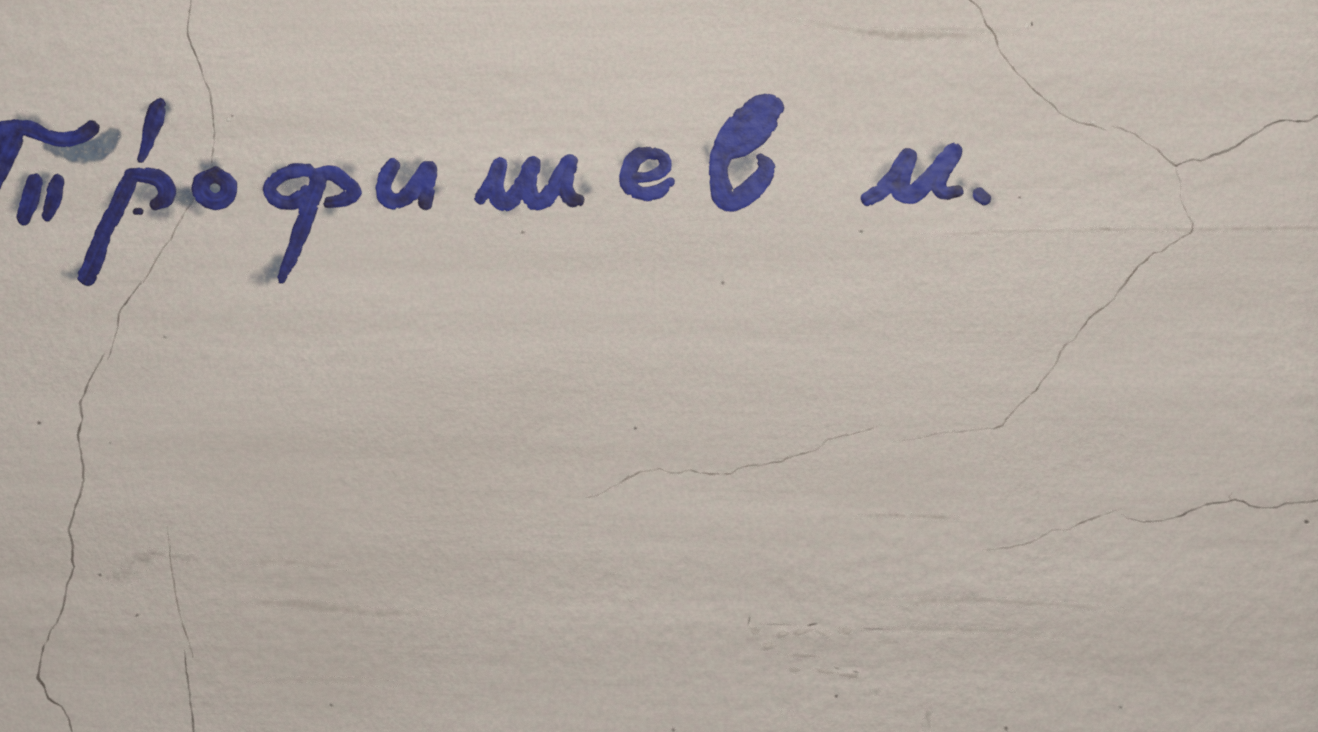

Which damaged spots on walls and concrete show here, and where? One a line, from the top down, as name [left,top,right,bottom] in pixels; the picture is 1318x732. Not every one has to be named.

crack [37,514,75,731]